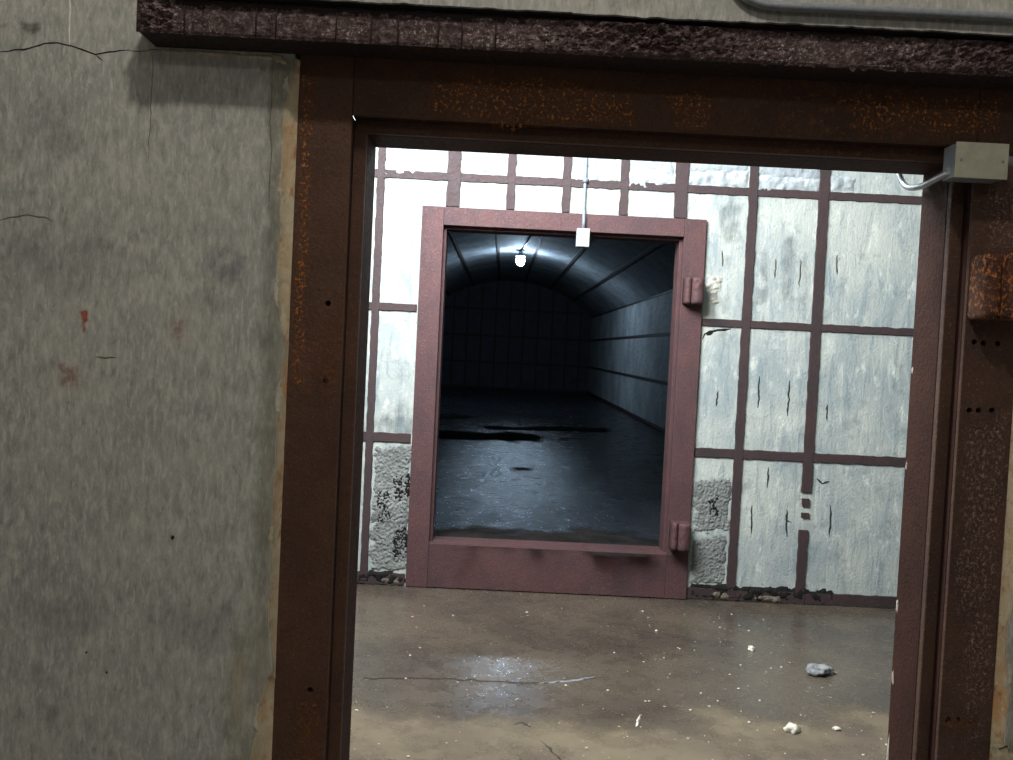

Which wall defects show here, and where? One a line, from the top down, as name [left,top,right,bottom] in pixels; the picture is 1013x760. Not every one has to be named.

crack [0,42,157,159]
rust [428,76,634,127]
flaking render [161,49,300,760]
crack [513,722,561,760]
rust [955,415,1010,739]
flaking render [989,411,1013,760]